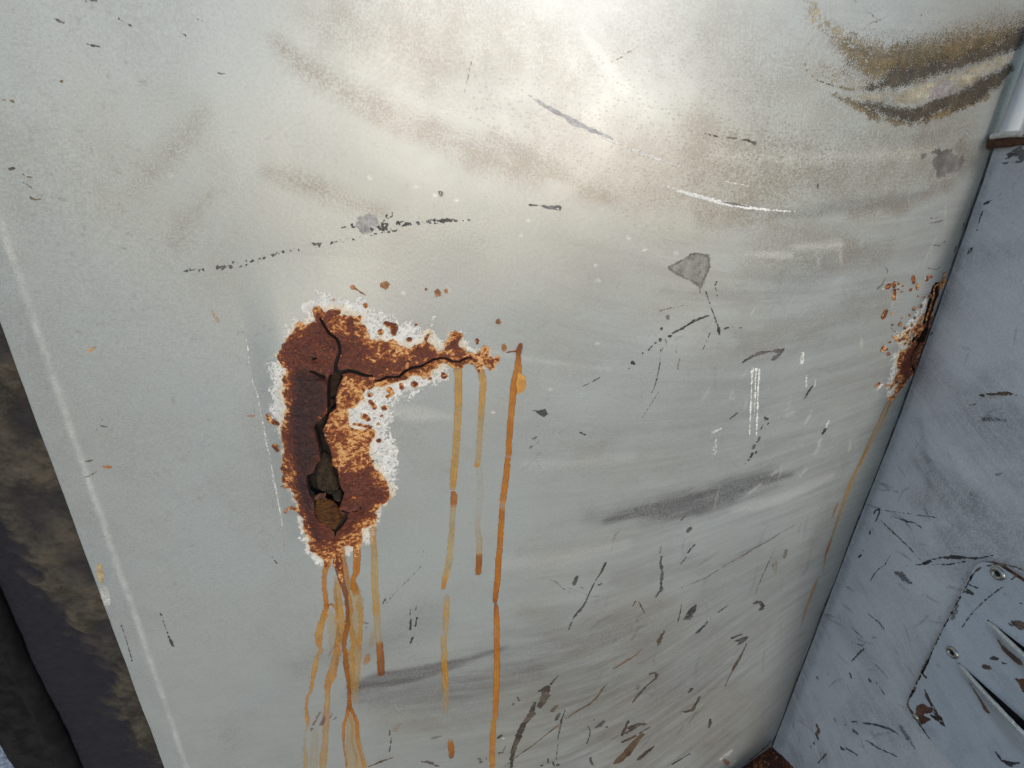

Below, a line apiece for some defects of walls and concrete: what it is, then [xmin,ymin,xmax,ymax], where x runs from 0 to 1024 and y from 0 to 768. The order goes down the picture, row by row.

rust [247,285,526,768]
rust [834,272,946,520]